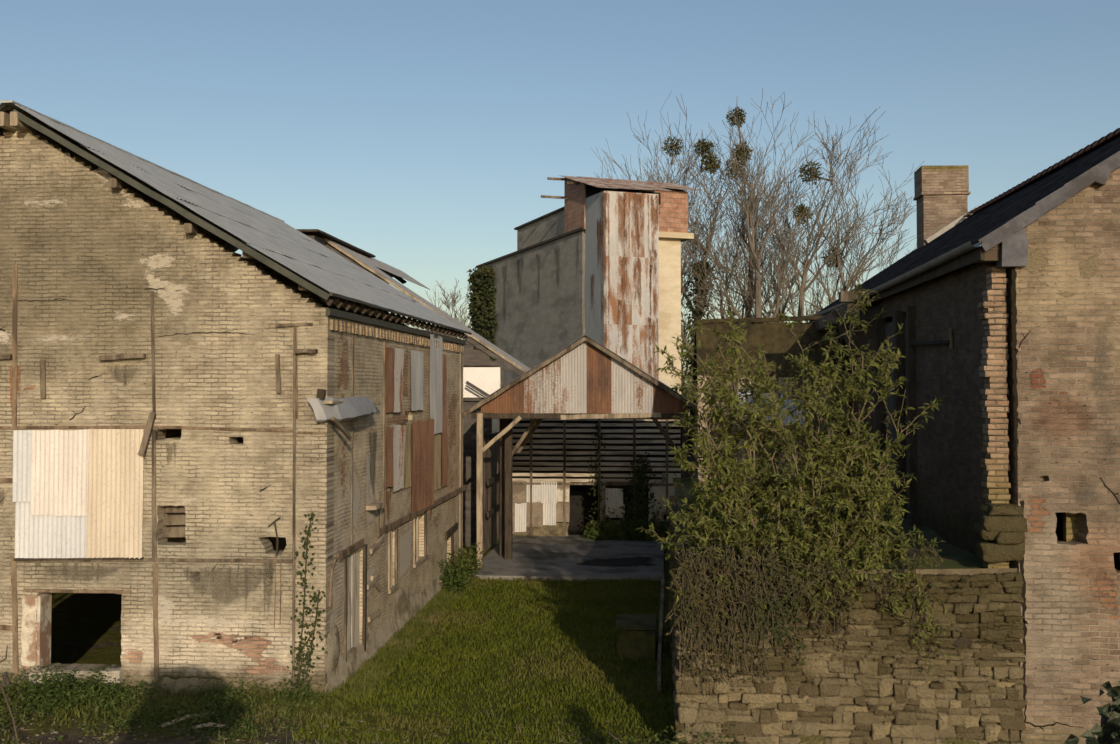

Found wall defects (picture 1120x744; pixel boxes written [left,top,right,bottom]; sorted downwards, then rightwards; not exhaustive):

corrosion [591,193,659,380]
crack [1011,267,1083,732]
spalling [190,632,292,675]